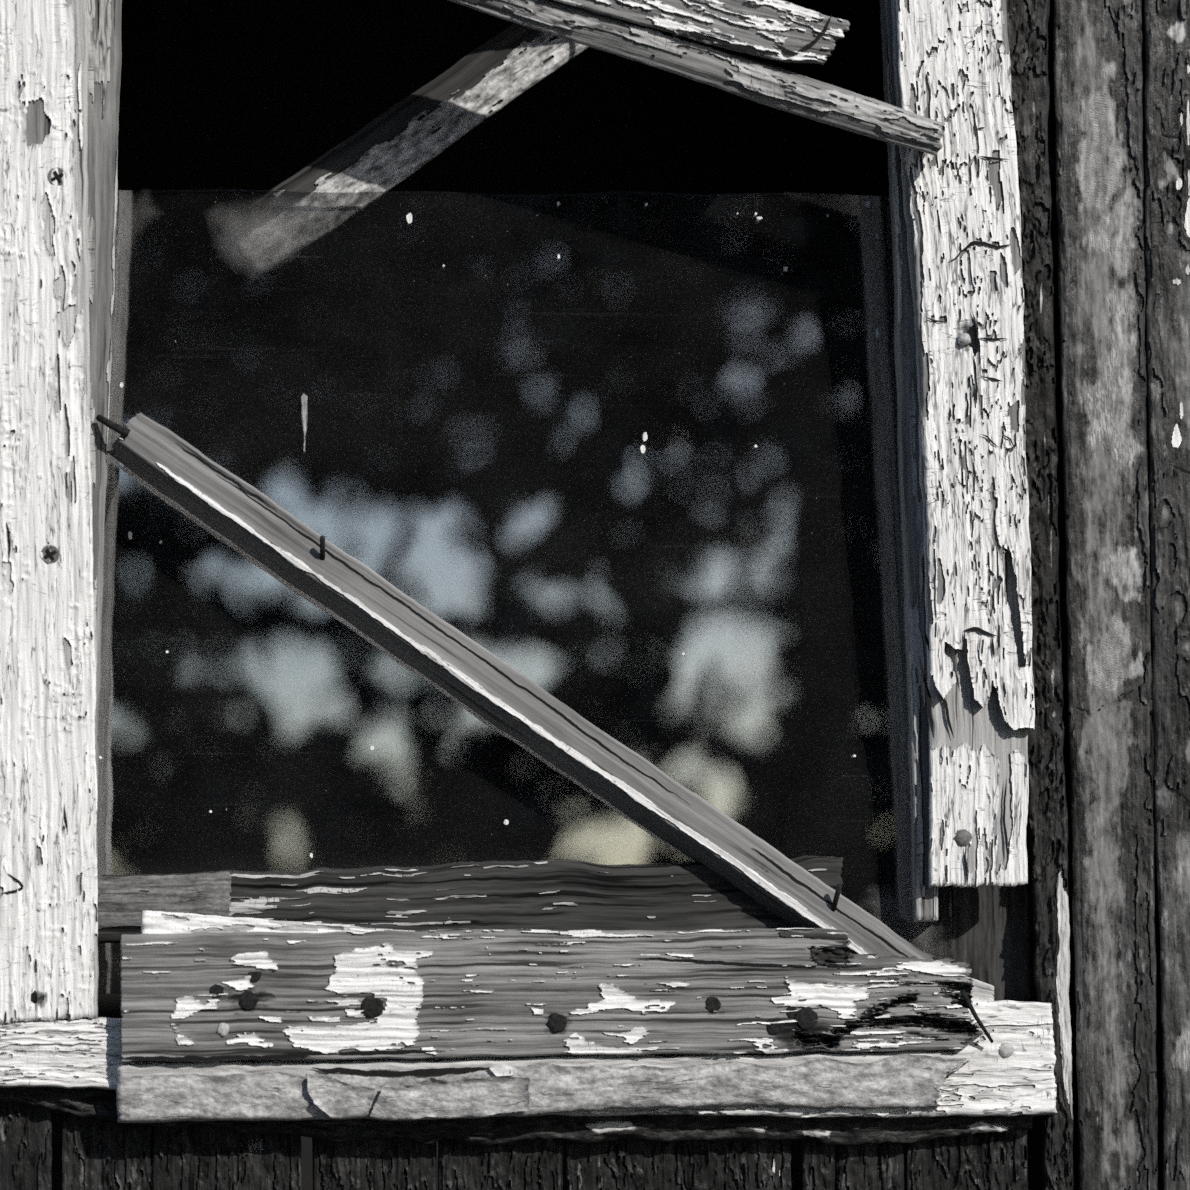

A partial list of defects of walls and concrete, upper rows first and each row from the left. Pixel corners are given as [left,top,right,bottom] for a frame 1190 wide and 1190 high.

peeling [26,99,50,146]
crack [978,127,1009,160]
peeling [1159,156,1190,237]
crack [949,241,1009,262]
crack [972,310,1006,404]
peeling [1160,251,1190,449]
crack [980,433,1014,447]
peeling [1064,0,1144,1190]
peeling [778,931,850,968]
spalling [793,981,979,1050]
peeling [1056,867,1073,1120]
peeling [1162,833,1190,1102]